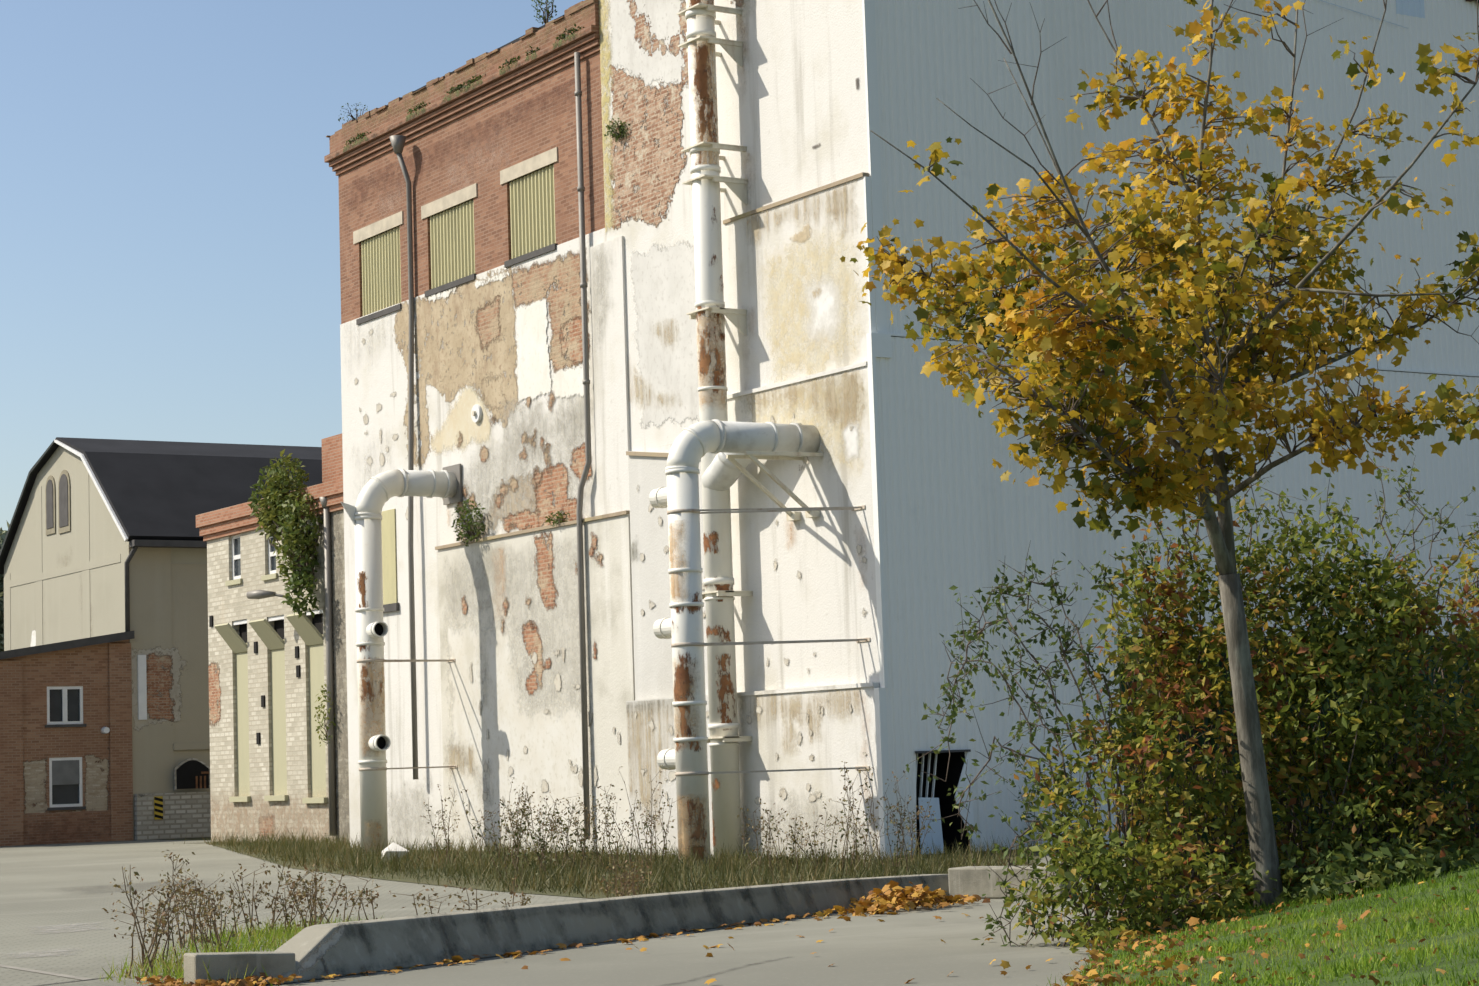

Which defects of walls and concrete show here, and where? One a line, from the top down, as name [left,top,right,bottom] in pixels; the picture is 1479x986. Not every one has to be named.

spalling [607,0,689,229]
rust [693,41,717,165]
rust [696,306,725,403]
flaking render [359,251,592,696]
spalling [575,532,603,576]
rust [669,526,736,730]
rust [674,653,701,752]
flaking render [453,762,505,815]
flaking render [569,760,598,788]
rust [680,778,720,866]